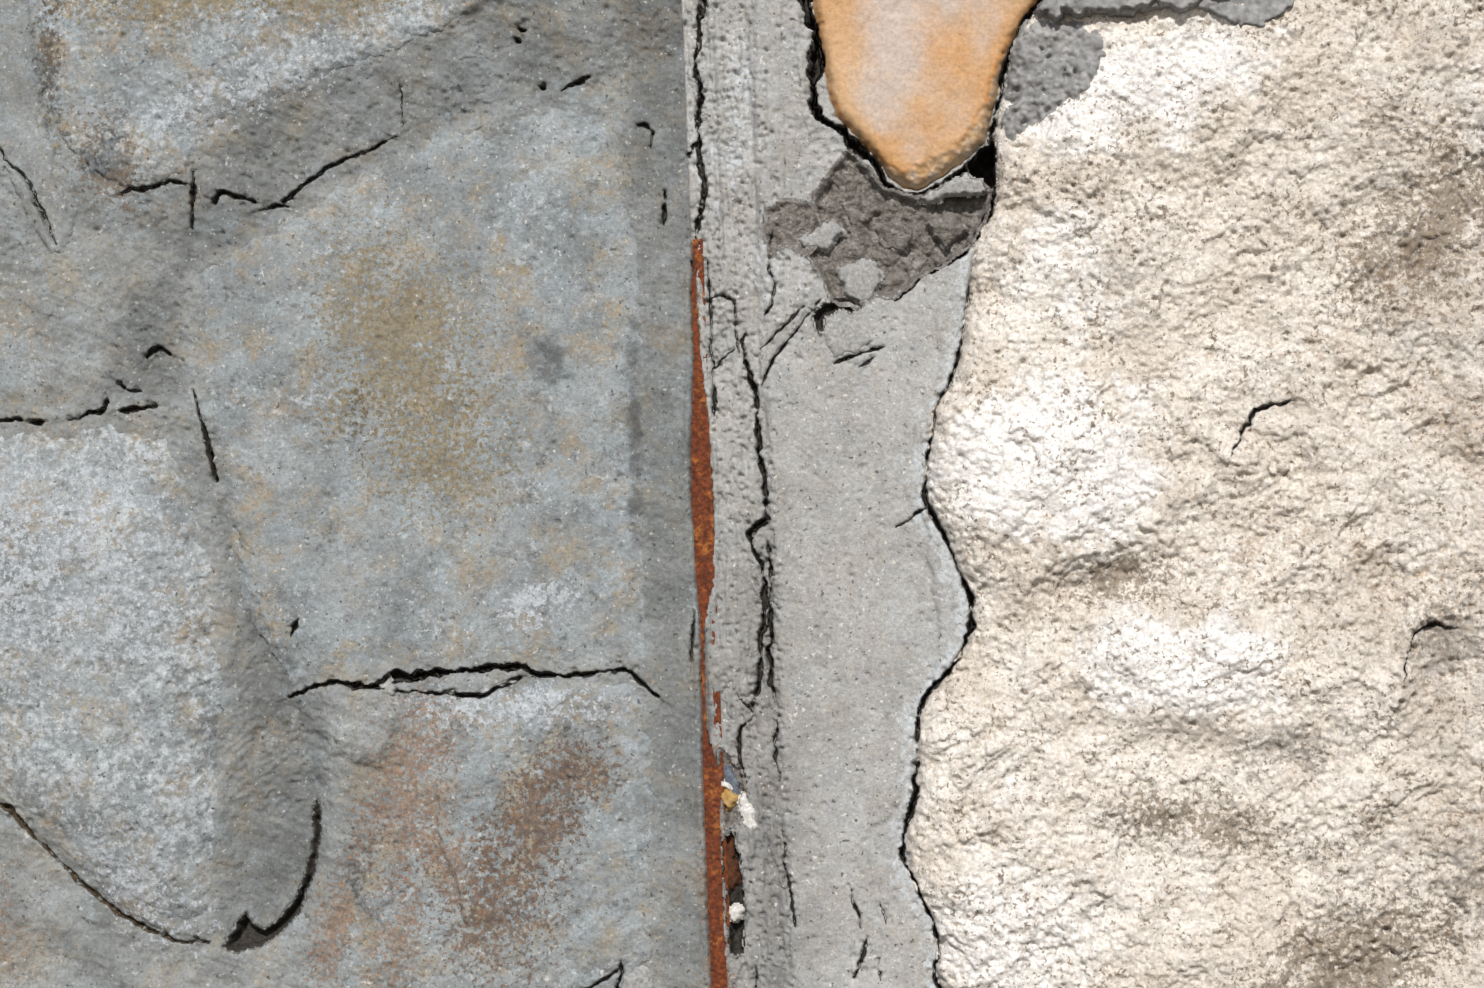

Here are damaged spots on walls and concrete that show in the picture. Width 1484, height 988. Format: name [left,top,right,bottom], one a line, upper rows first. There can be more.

peeling [1033,0,1294,27]
crack [120,83,404,229]
spalling [760,149,993,358]
crack [193,390,219,480]
crack [661,0,821,804]
crack [799,0,1041,988]
crack [1231,400,1290,456]
crack [290,662,659,699]
rust [696,614,735,988]
crack [0,803,210,944]
crack [782,831,796,927]
crack [590,961,624,988]